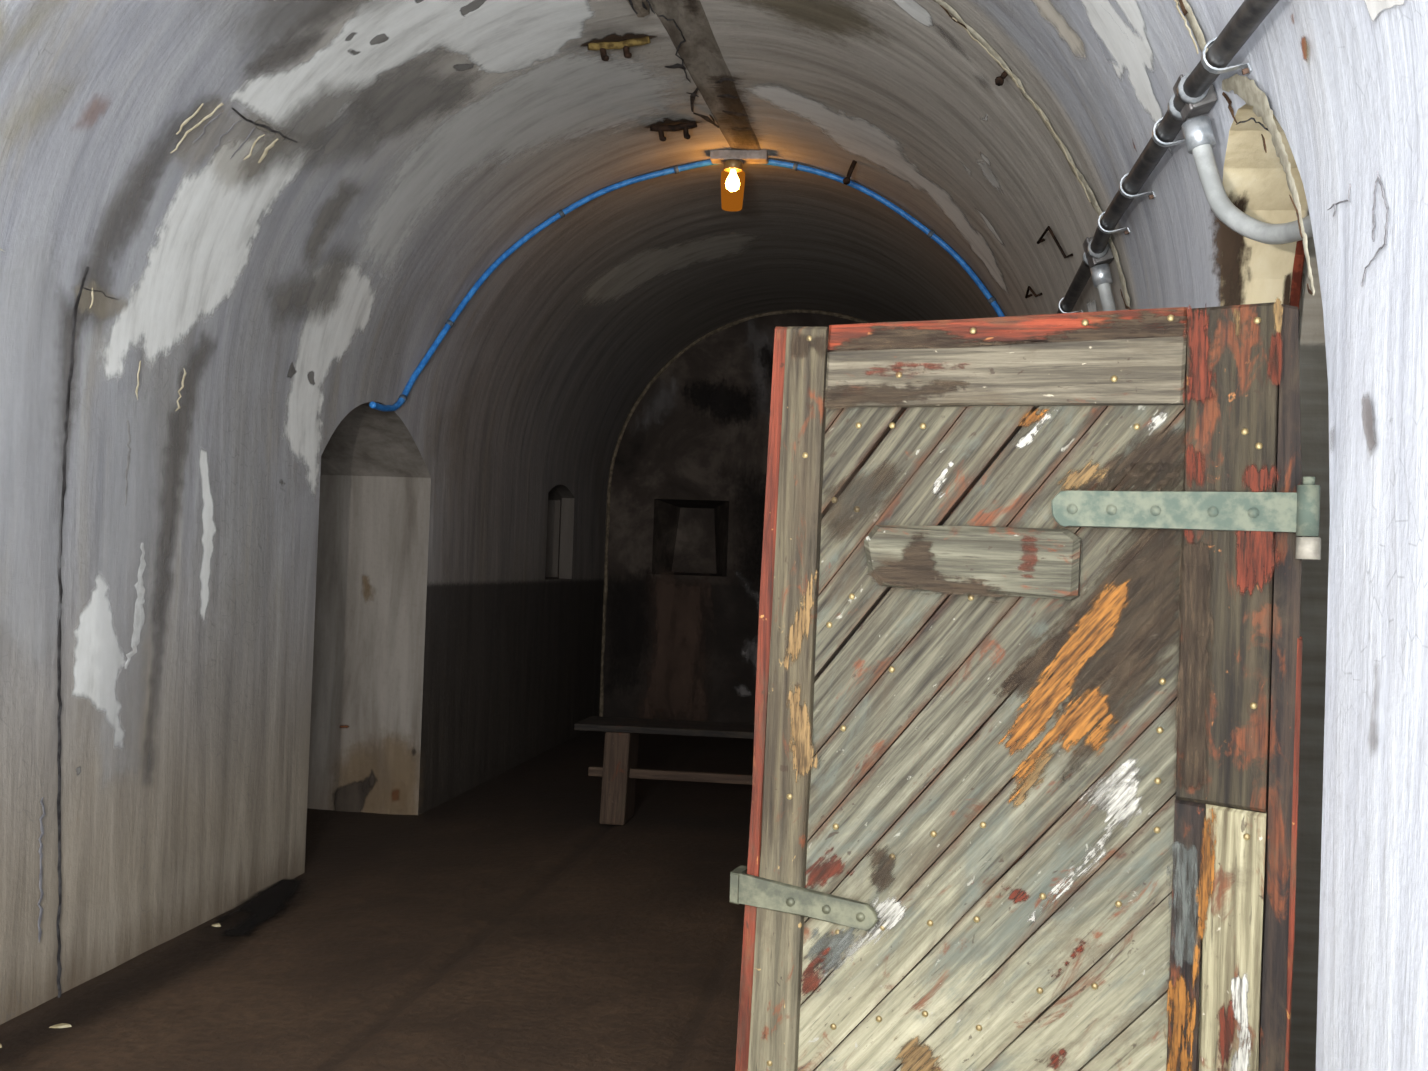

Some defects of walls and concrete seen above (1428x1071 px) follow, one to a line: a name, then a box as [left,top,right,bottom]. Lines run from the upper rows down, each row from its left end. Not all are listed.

peeling [1033,0,1162,126]
peeling [1365,0,1404,21]
peeling [80,0,699,494]
flaking render [1222,73,1315,295]
crack [1328,171,1388,287]
leakage [684,380,752,423]
leakage [761,345,773,382]
peeling [1273,298,1283,333]
leakage [737,474,766,577]
peeling [72,543,146,748]